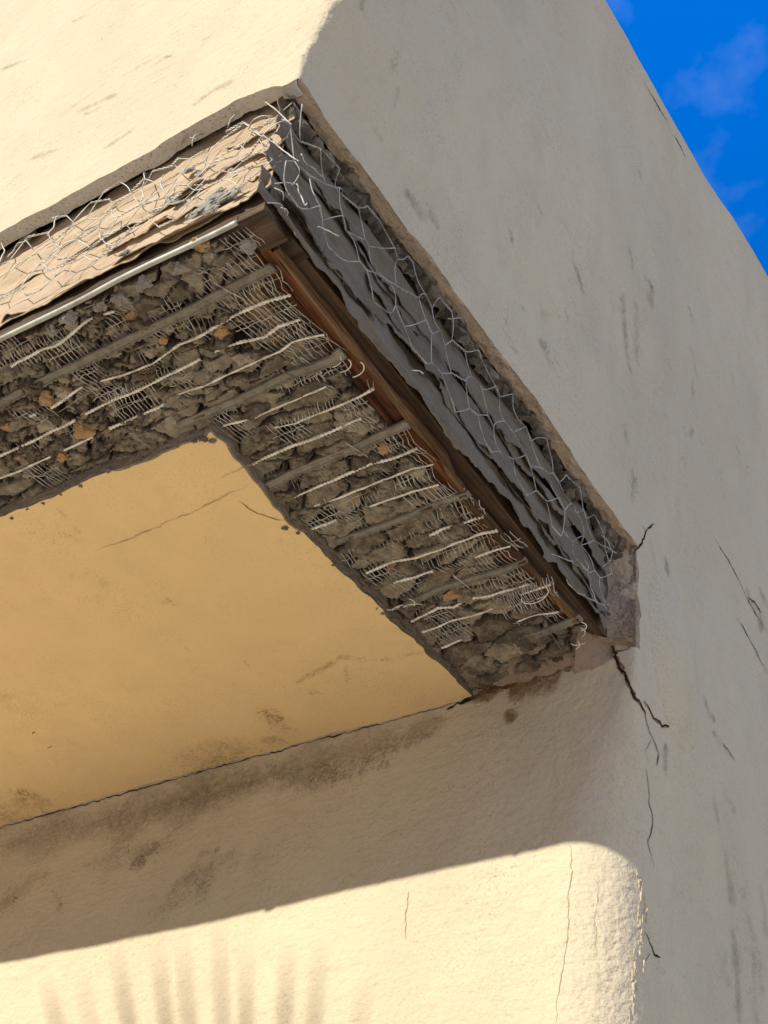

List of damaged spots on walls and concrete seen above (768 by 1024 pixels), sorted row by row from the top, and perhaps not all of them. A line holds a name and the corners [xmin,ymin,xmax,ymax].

spalling [0,78,641,710]
crack [96,463,277,551]
crack [633,524,653,554]
crack [717,542,767,672]
crack [610,645,669,863]